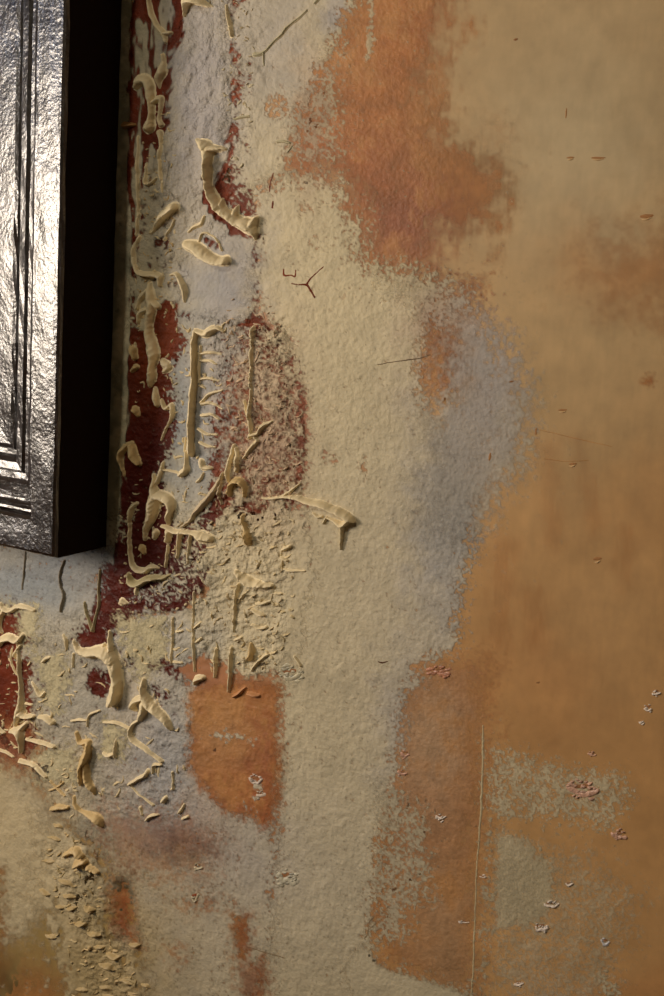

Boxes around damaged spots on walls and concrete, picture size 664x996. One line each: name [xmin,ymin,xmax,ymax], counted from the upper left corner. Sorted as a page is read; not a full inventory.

rust [283,0,500,278]
crack [283,266,324,298]
peeling [0,610,26,636]
peeling [0,642,19,758]